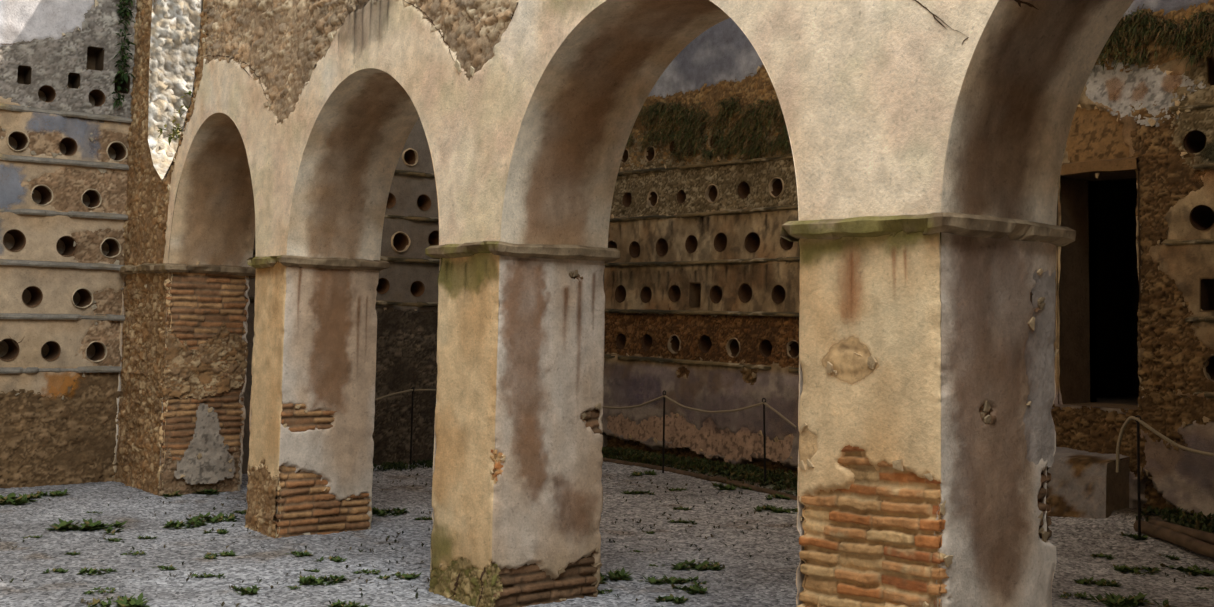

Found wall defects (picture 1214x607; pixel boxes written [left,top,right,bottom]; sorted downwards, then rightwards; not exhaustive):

spalling [403,0,519,80]
crack [914,0,969,44]
spalling [0,0,377,538]
damp [504,258,546,376]
spalling [1023,0,1214,542]
spalling [372,307,438,466]
spalling [490,449,506,485]
flaking render [429,548,602,607]
damp [517,402,545,488]
flaking render [798,445,953,607]